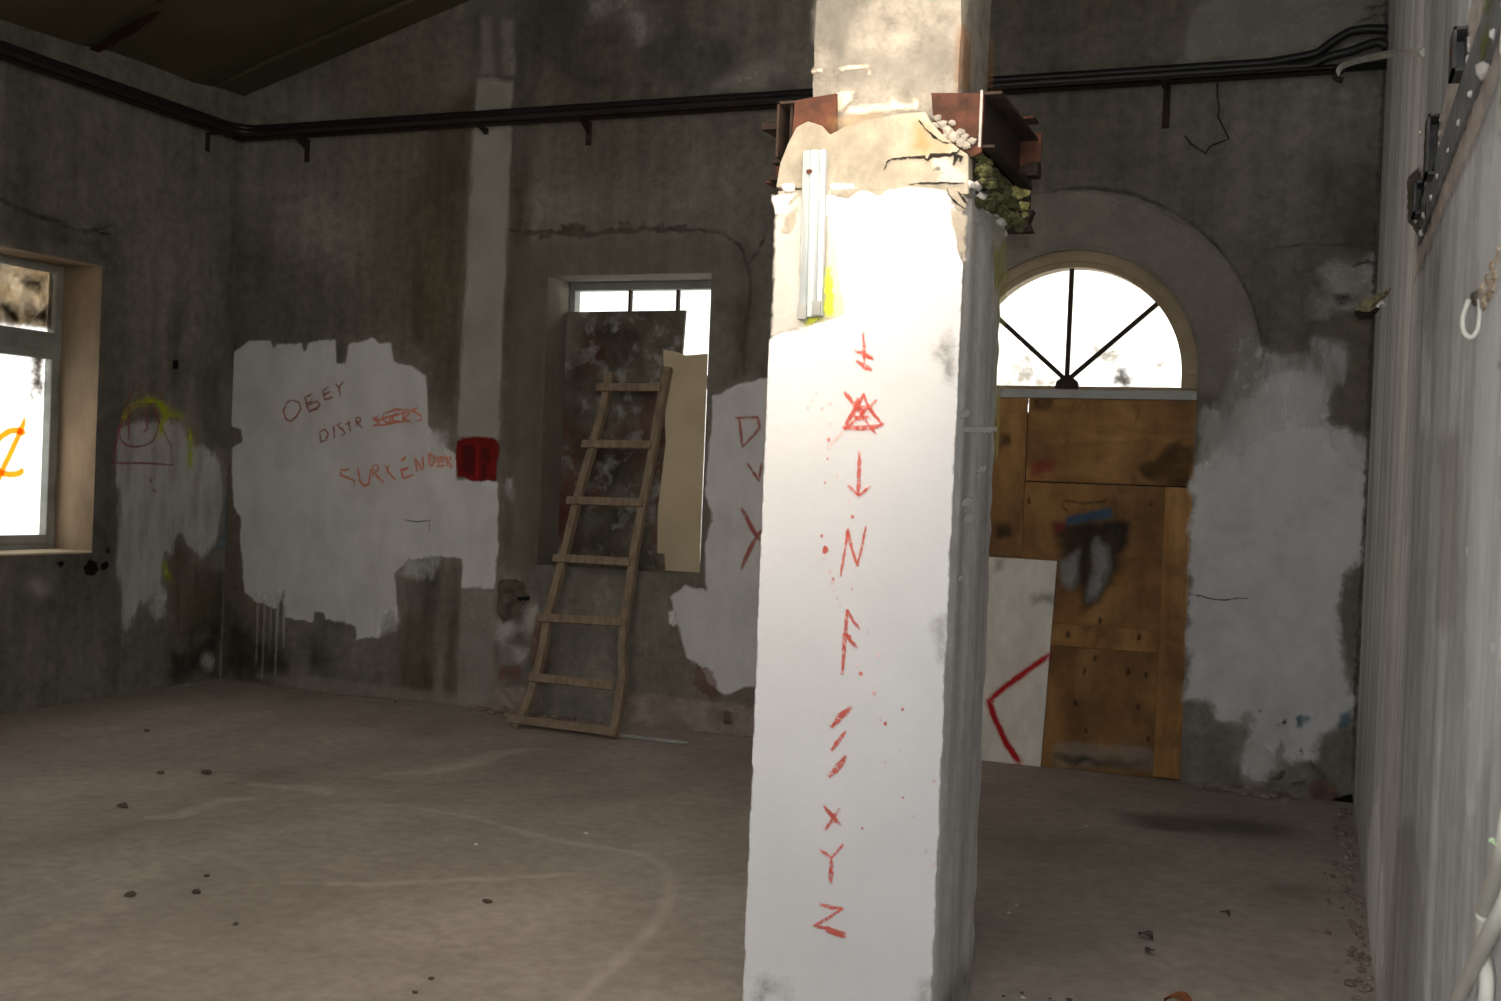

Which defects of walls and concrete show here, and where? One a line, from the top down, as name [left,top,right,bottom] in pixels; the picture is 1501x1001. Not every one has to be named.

peeling [772,183,798,233]
peeling [826,184,950,215]
spalling [968,154,1030,238]